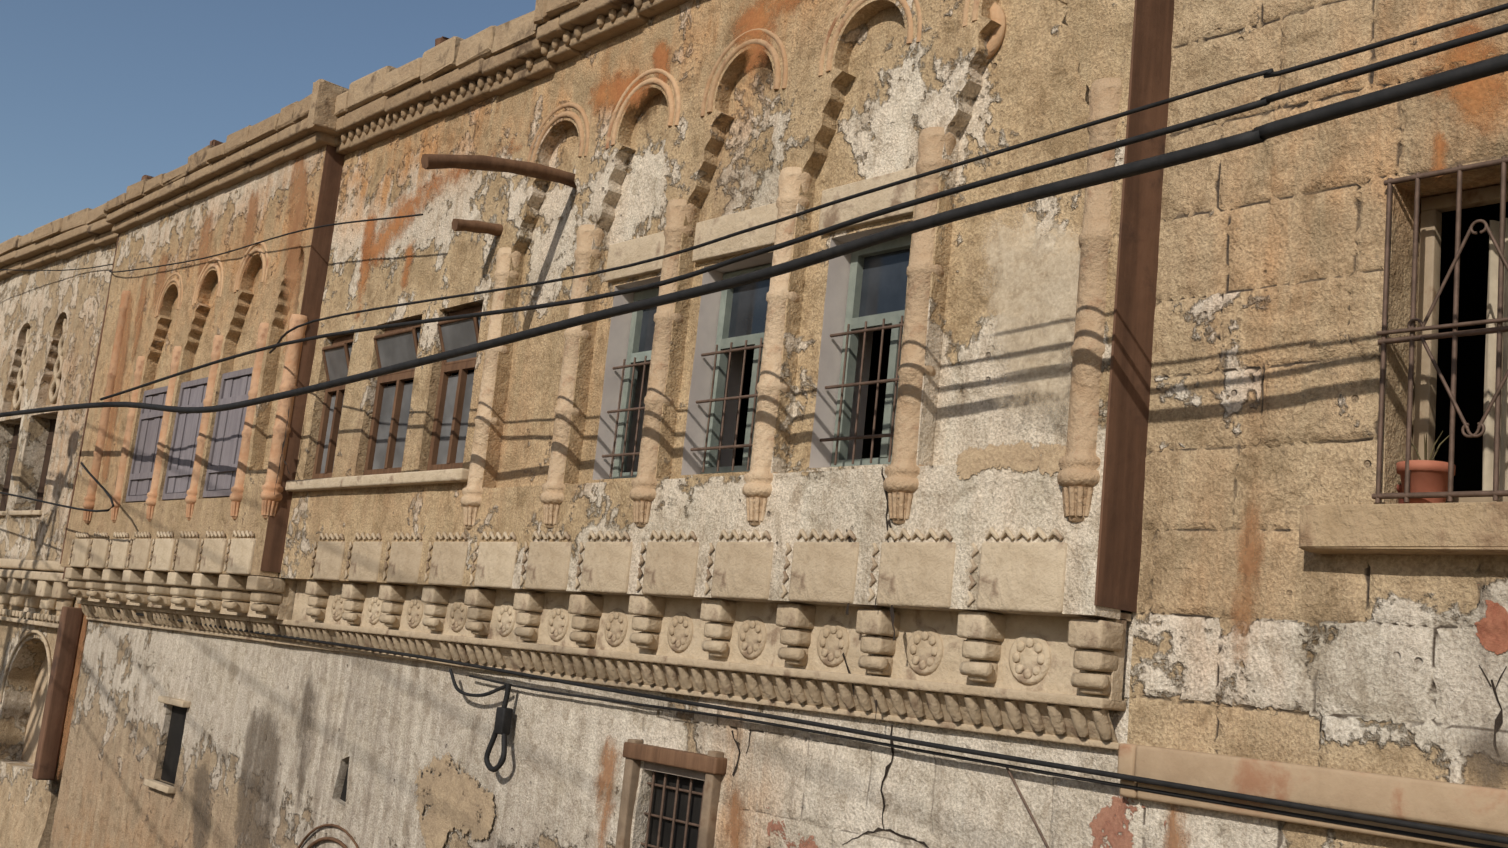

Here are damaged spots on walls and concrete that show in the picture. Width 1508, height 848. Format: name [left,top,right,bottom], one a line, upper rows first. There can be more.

crack [846,466,895,542]
crack [845,596,895,640]
spalling [1474,600,1508,655]
crack [1479,665,1507,757]
crack [842,652,929,848]